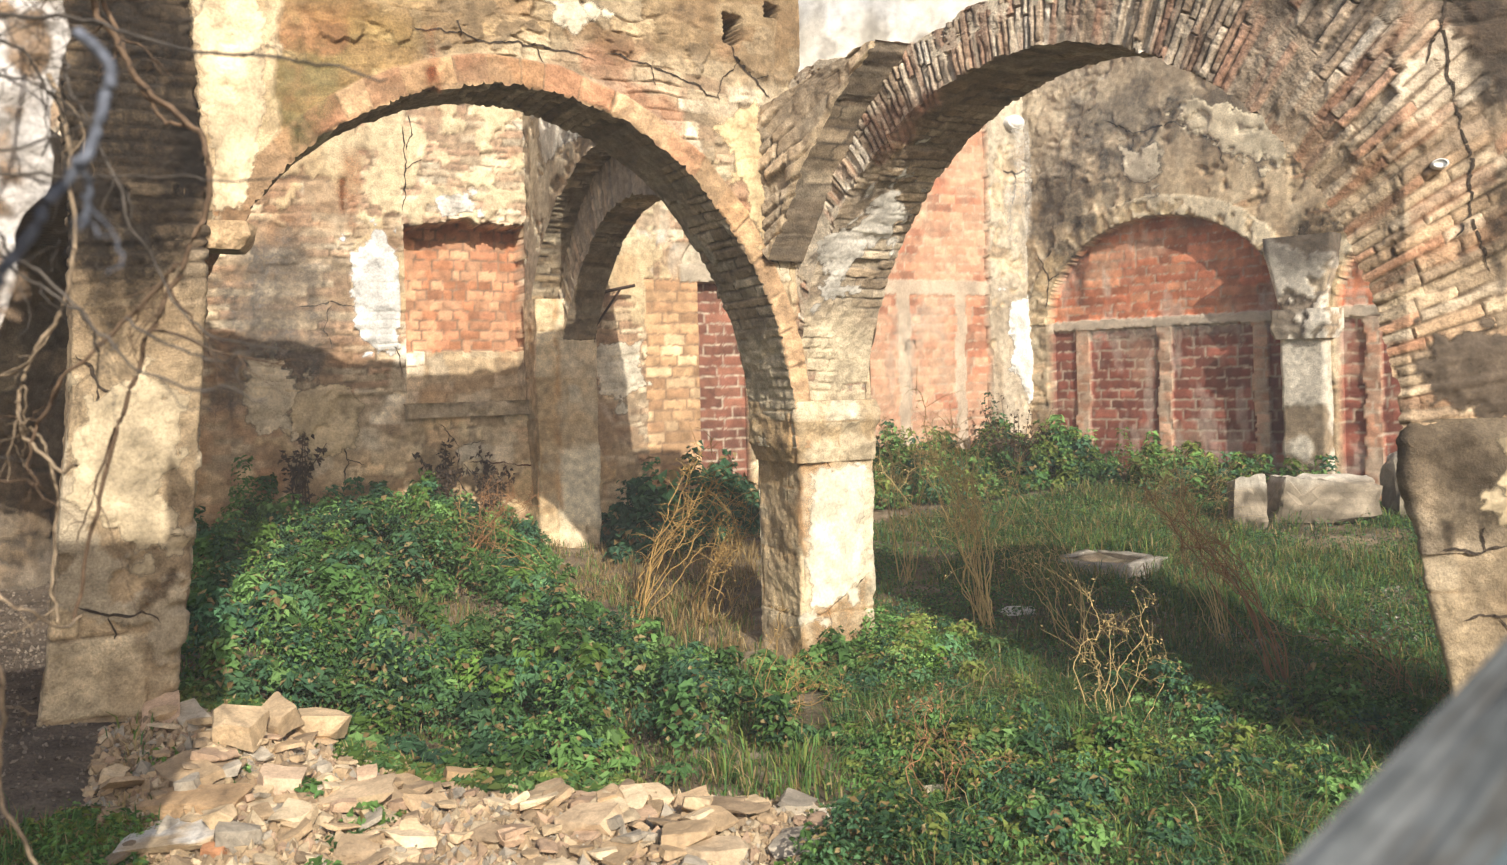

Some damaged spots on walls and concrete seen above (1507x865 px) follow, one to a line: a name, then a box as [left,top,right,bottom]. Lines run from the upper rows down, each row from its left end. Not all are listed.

flaking render [546,0,614,34]
crack [410,20,770,108]
crack [1426,0,1490,271]
flaking render [339,218,401,357]
flaking render [998,288,1034,404]
spalling [1414,317,1507,418]
flaking render [1480,436,1507,526]
crack [1443,528,1507,555]